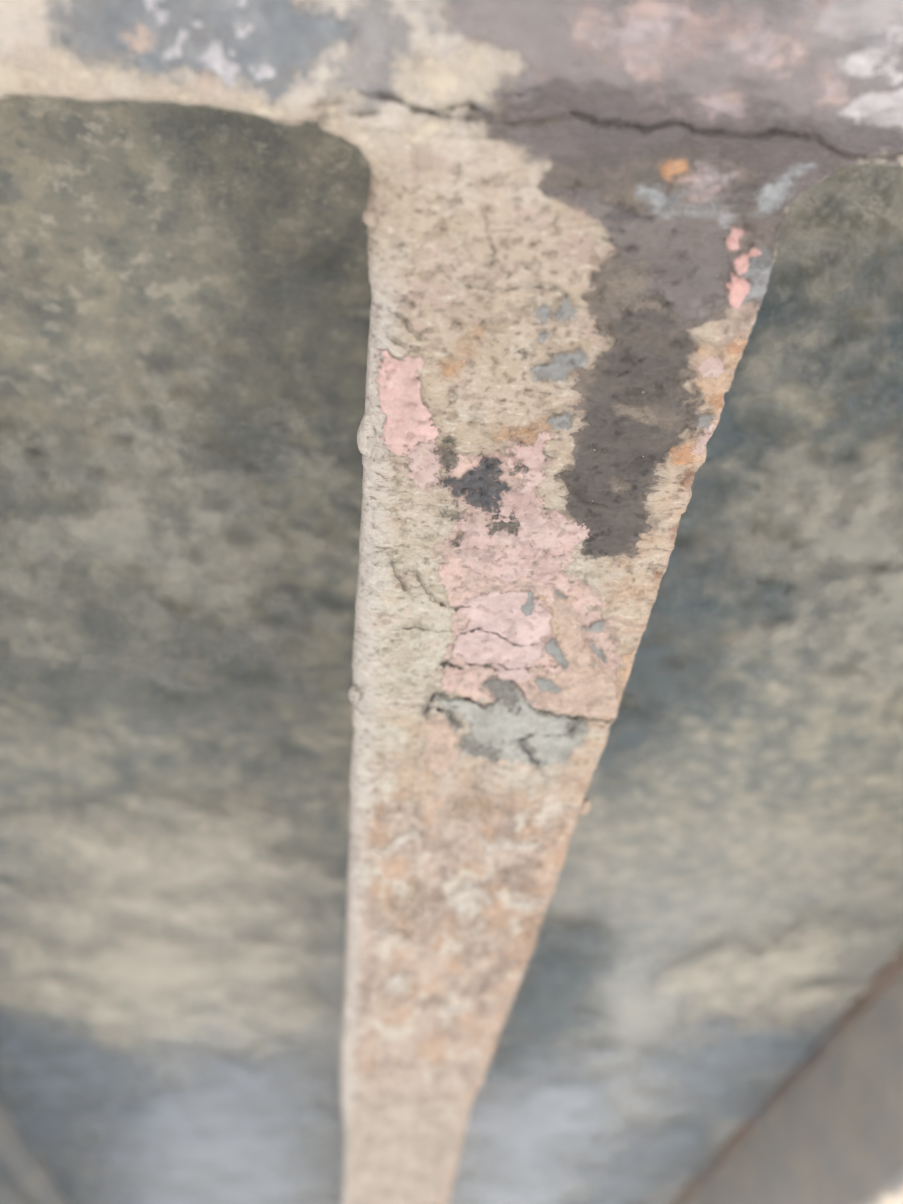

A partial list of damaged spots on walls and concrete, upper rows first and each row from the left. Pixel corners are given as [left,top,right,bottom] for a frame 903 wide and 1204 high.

crack [308,92,903,162]
damp [0,0,903,774]
peeling [375,350,627,773]